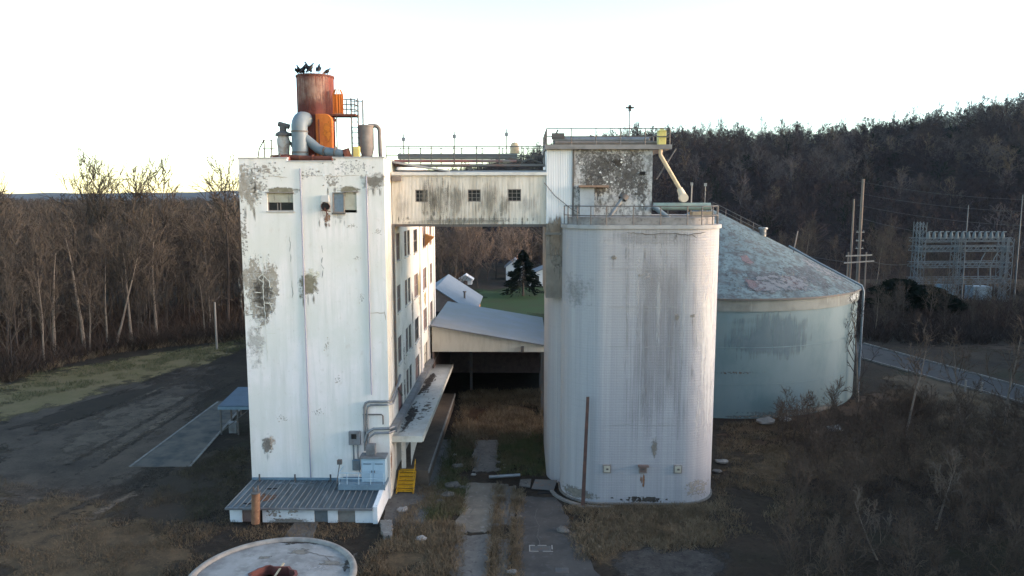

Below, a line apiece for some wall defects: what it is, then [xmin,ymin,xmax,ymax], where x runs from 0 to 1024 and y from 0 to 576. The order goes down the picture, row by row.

corrosion [298,72,329,116]
damp [422,178,467,220]
damp [481,189,509,225]
peeling [576,149,650,209]
peeling [234,158,285,326]
peeling [727,254,848,294]